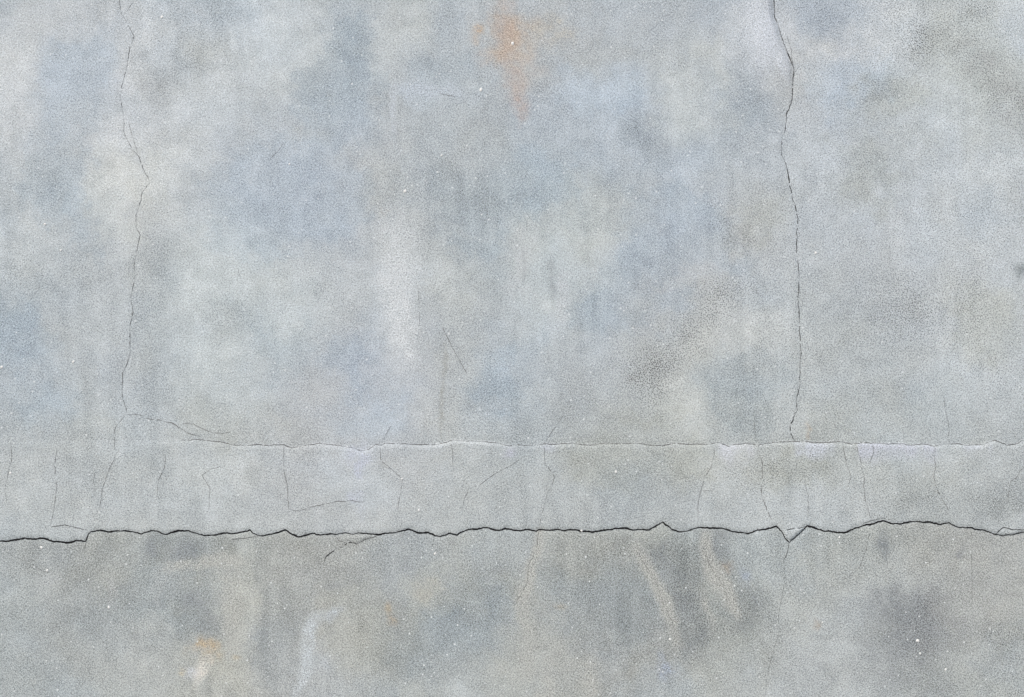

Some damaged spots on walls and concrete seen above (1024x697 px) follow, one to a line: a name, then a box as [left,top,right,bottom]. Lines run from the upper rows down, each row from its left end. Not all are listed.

corrosion [460,0,599,132]
crack [773,0,799,253]
crack [0,265,1024,618]